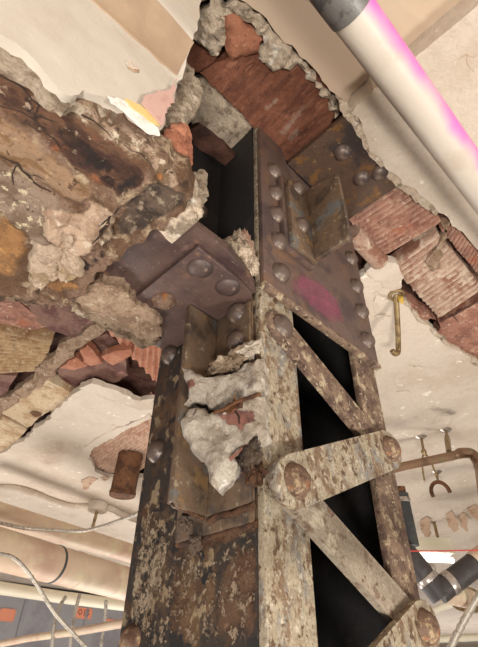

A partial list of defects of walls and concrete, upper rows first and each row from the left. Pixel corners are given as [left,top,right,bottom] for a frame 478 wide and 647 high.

crack [0,75,60,148]
peeling [107,78,178,136]
crack [73,112,152,166]
crack [0,156,55,196]
spalling [81,216,116,270]
spalling [81,413,152,490]
corrosion [242,461,268,487]
corrosion [170,502,258,556]
corrosion [217,549,256,633]